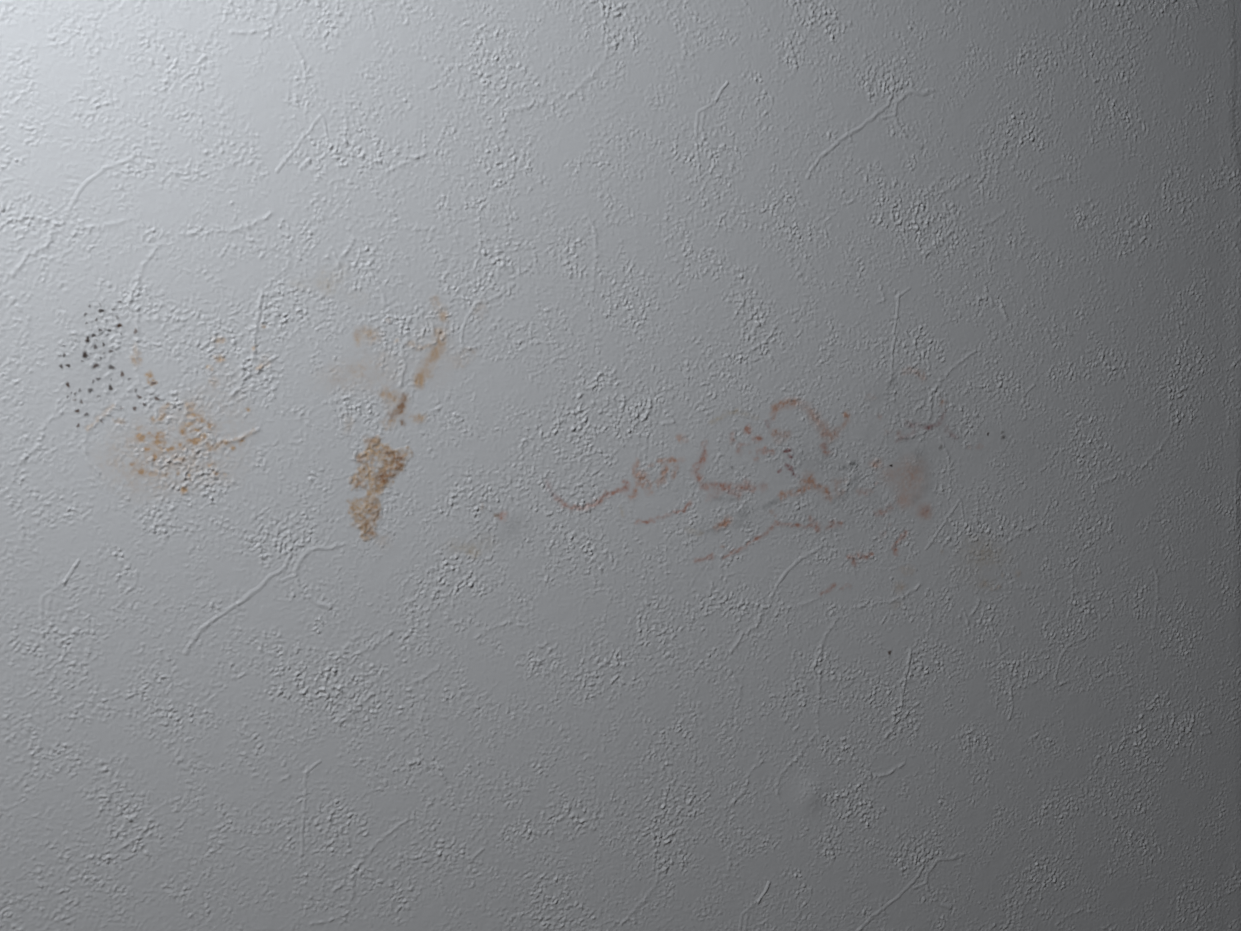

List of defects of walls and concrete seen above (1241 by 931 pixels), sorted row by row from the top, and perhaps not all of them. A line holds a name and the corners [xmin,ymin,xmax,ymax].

damp [54,294,161,428]
damp [542,363,1072,612]